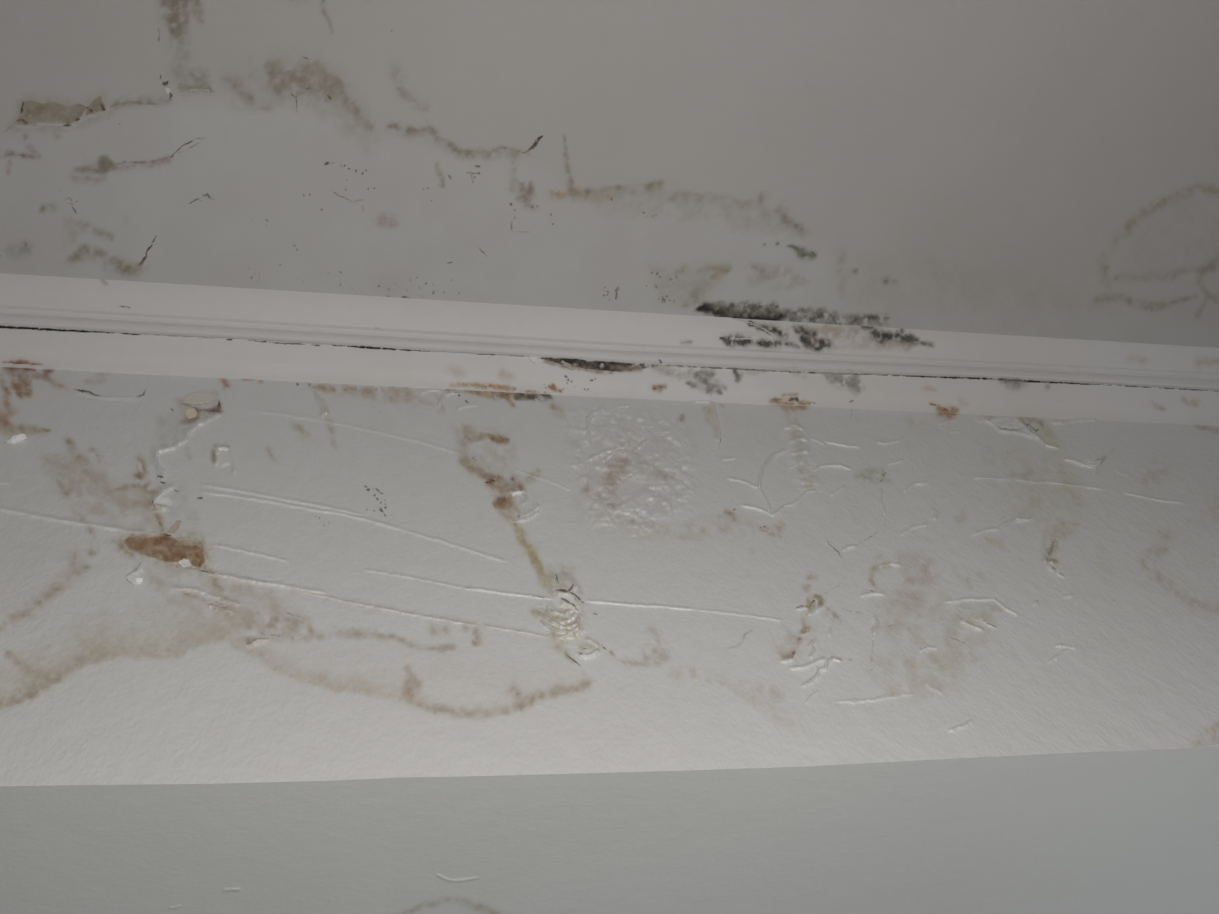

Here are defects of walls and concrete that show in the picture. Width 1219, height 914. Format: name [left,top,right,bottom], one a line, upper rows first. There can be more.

peeling [3,87,117,145]
crack [0,90,206,282]
leakage [0,0,1219,398]
leakage [0,432,815,739]
leakage [857,544,1000,708]